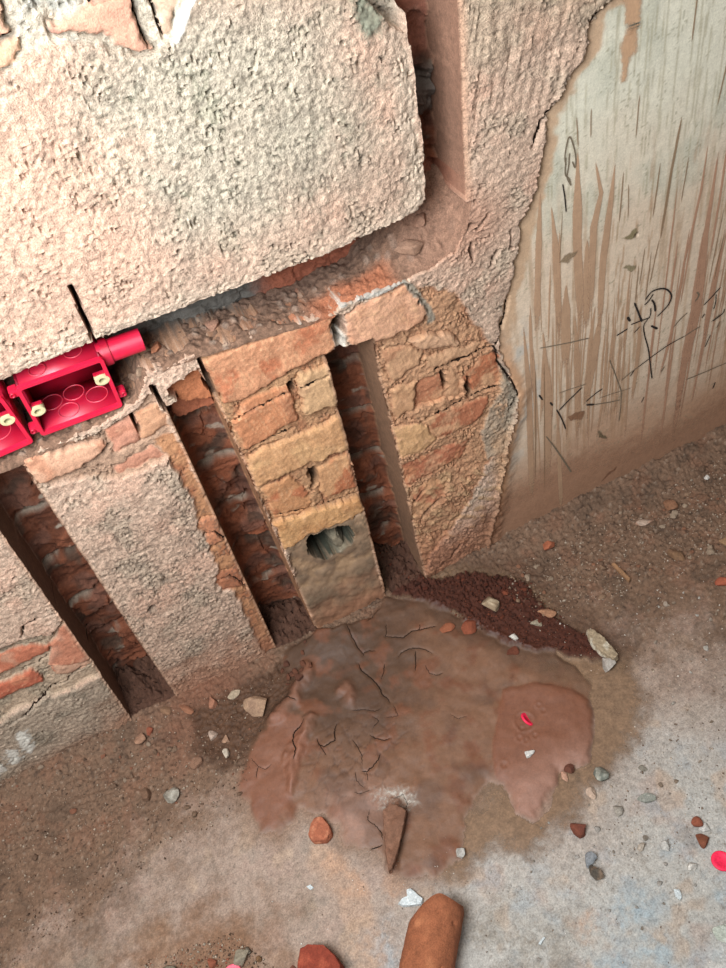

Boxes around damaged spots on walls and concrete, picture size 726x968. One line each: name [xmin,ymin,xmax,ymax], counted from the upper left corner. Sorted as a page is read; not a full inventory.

spalling [0,0,186,75]
spalling [369,0,405,31]
leakage [635,117,682,301]
spalling [167,282,519,576]
leakage [535,367,545,486]
spalling [22,394,276,654]
spalling [0,618,101,724]